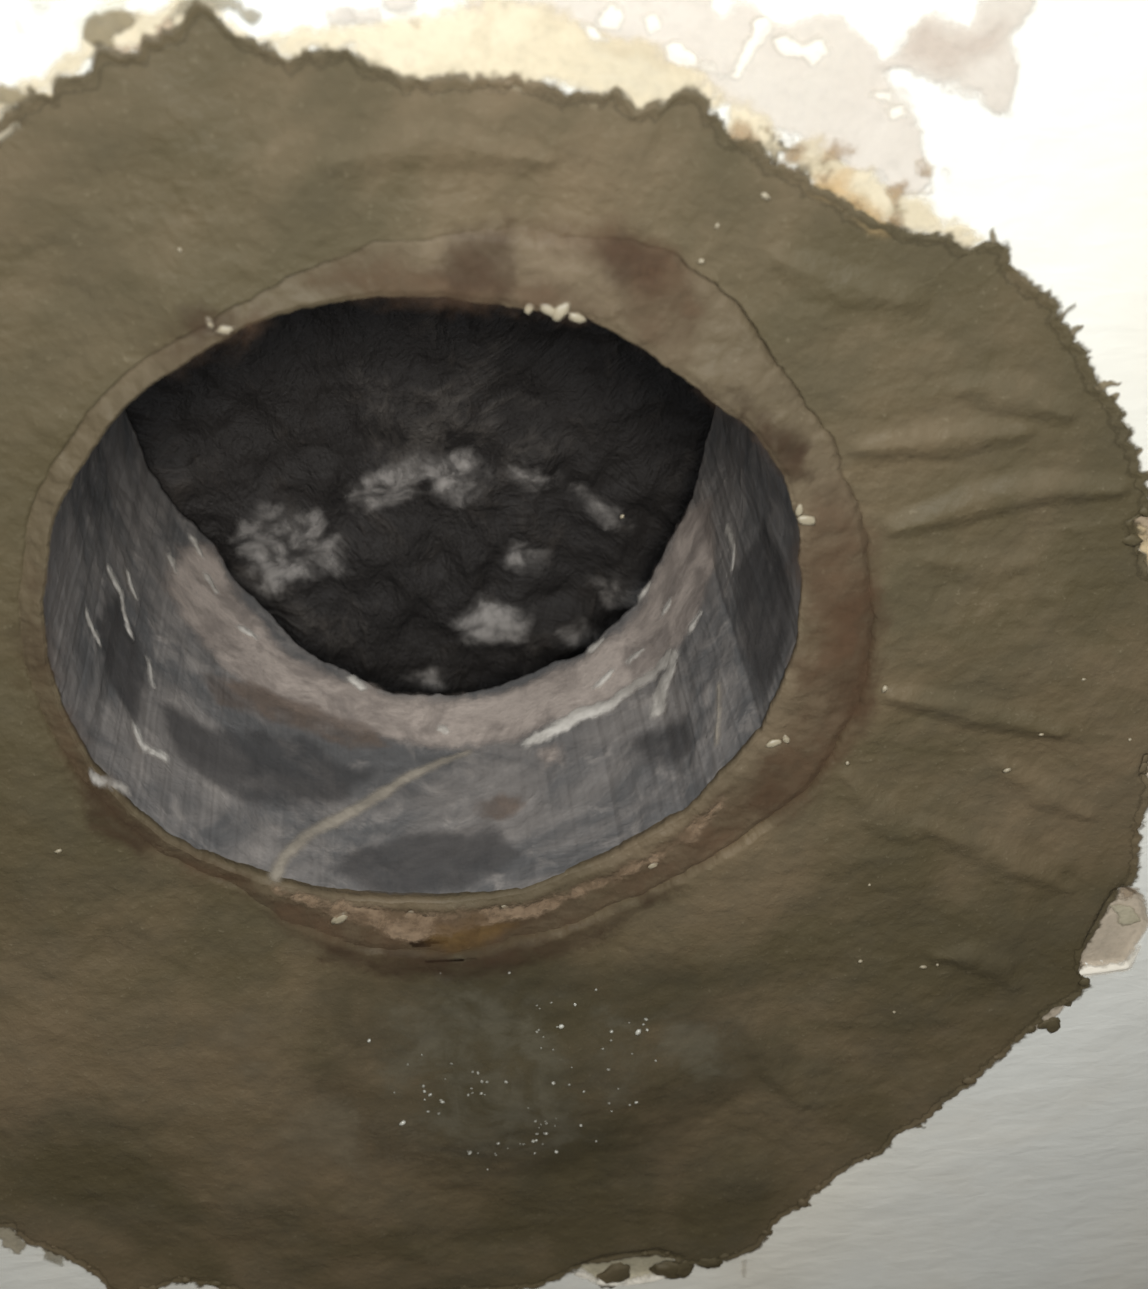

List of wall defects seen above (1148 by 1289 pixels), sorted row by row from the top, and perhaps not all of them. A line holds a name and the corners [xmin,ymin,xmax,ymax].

peeling [0,0,1033,249]
leakage [350,454,471,506]
leakage [238,512,335,592]
leakage [86,611,101,646]
leakage [107,565,137,638]
leakage [460,602,525,643]
leakage [348,676,366,691]
leakage [523,650,676,761]
leakage [133,722,167,761]
leakage [90,770,127,793]
spalling [1079,886,1148,976]
leakage [467,1107,558,1171]